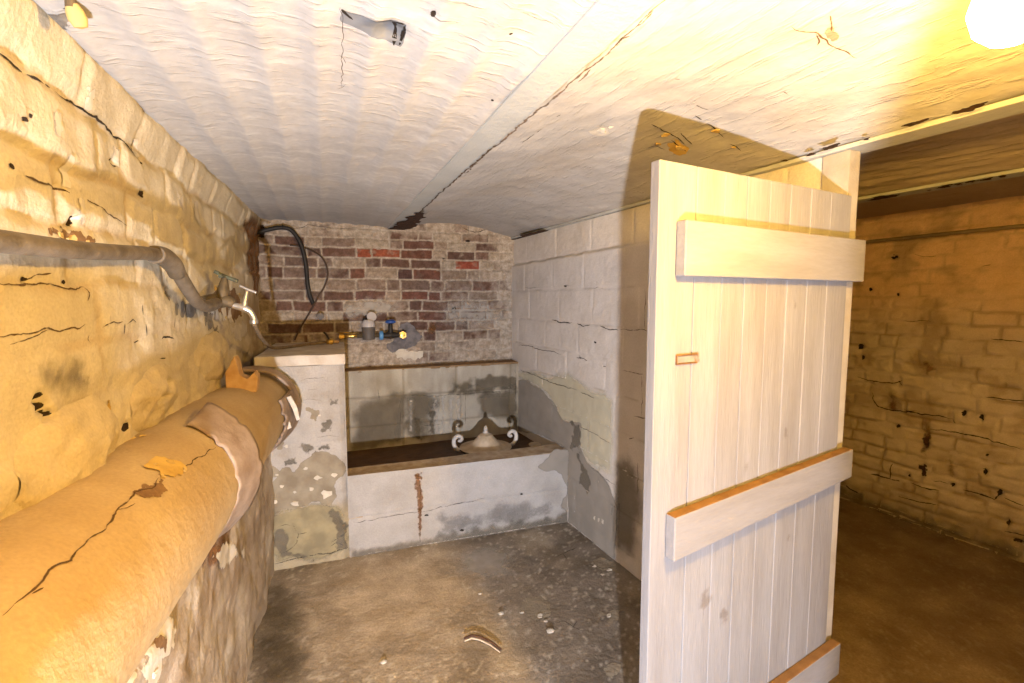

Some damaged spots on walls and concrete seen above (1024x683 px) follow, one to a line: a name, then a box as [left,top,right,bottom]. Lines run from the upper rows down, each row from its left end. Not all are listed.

crack [392,21,406,45]
crack [792,16,855,58]
crack [0,53,131,150]
flaking render [655,133,689,156]
crack [0,306,175,359]
leakage [354,394,436,450]
crack [859,377,1017,448]
peeling [272,451,346,516]
rust [414,472,423,535]
leakage [452,374,639,558]
crack [846,465,1024,506]